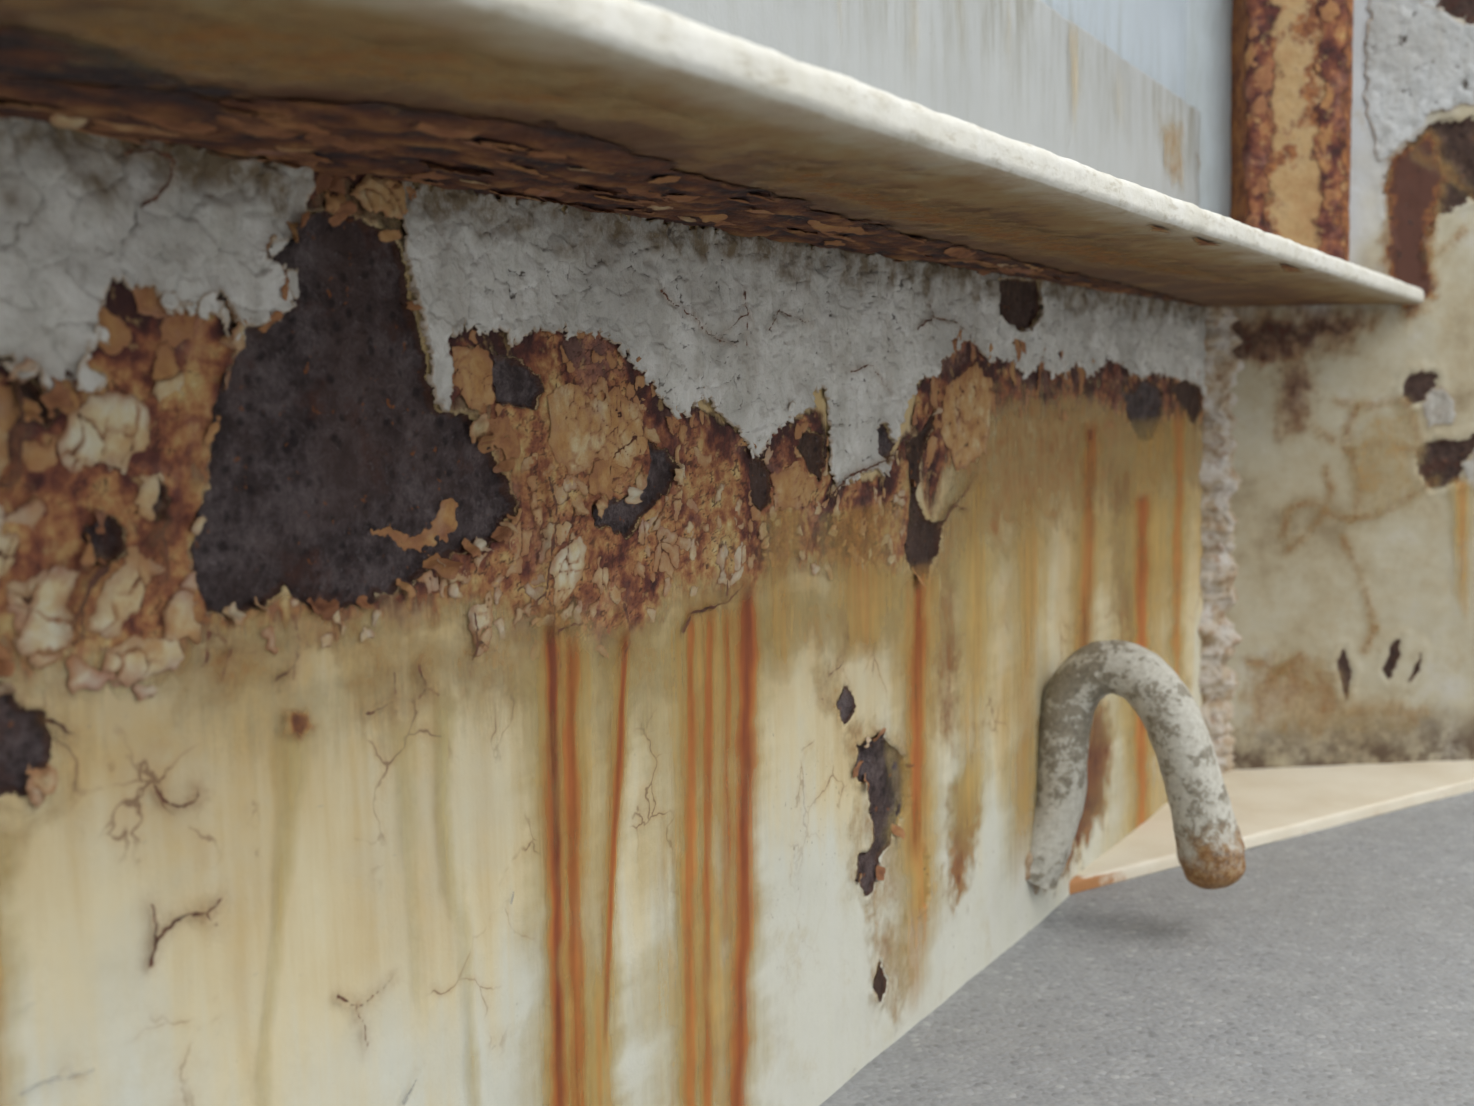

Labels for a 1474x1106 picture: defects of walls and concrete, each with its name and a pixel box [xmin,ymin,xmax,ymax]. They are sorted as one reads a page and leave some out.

corrosion [1242,0,1282,235]
corrosion [1310,0,1351,261]
peeling [1363,0,1474,162]
peeling [0,103,389,393]
peeling [401,122,1207,490]
crack [366,664,439,715]
crack [469,613,495,675]
corrosion [0,172,1205,1106]
crack [154,784,199,808]
crack [149,898,222,968]
crack [337,980,390,1047]